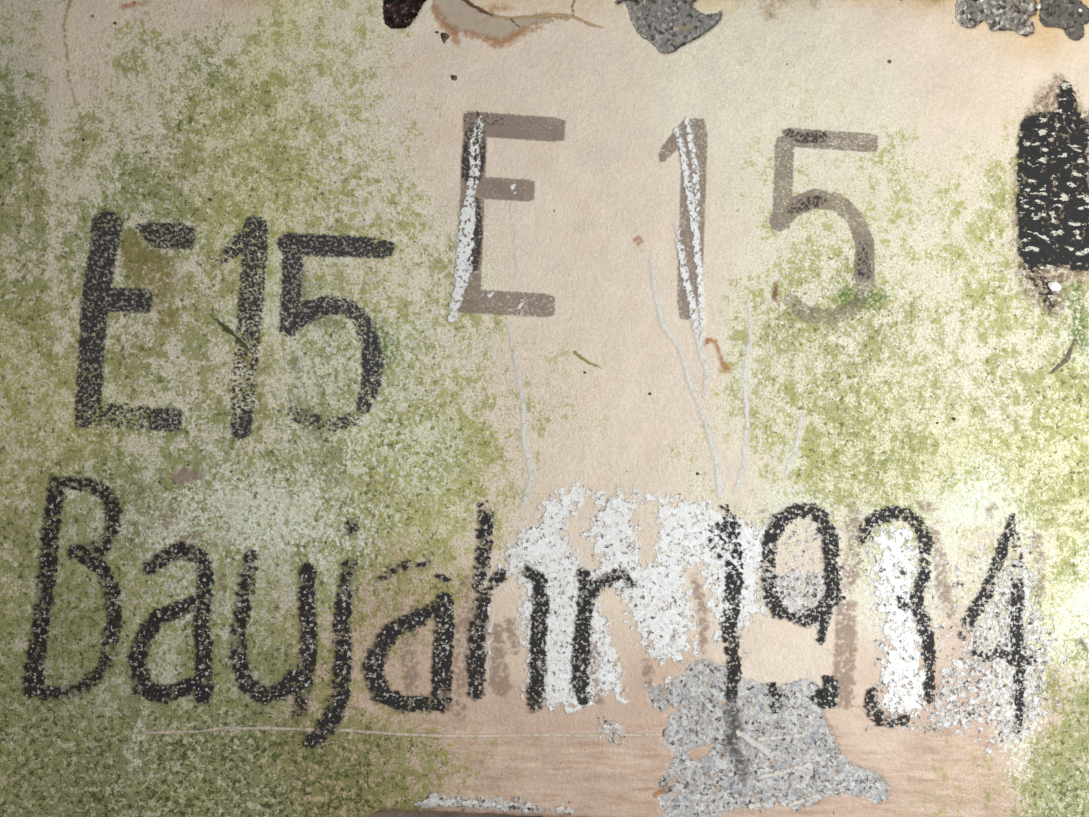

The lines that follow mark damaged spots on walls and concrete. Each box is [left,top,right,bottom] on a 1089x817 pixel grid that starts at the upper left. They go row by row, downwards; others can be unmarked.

peeling [382,0,569,48]
spalling [615,0,723,54]
spalling [955,0,1089,41]
damp [650,257,754,499]
damp [508,323,535,509]
peeling [482,482,1073,817]
peeling [414,791,576,815]